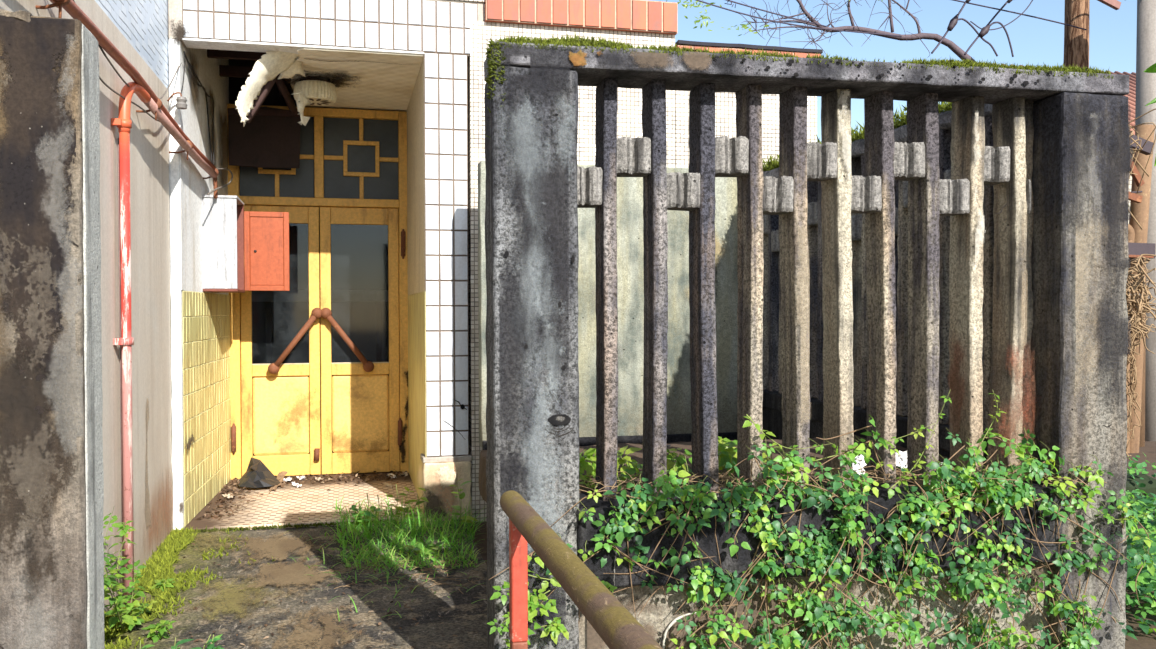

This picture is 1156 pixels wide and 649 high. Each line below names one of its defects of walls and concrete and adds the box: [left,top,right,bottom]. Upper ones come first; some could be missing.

leakage [502,44,580,98]
leakage [0,15,77,600]
leakage [500,264,527,436]
leakage [511,166,569,372]
leakage [1098,103,1133,404]
leakage [500,456,531,497]
leakage [528,544,566,649]
leakage [1099,495,1123,567]